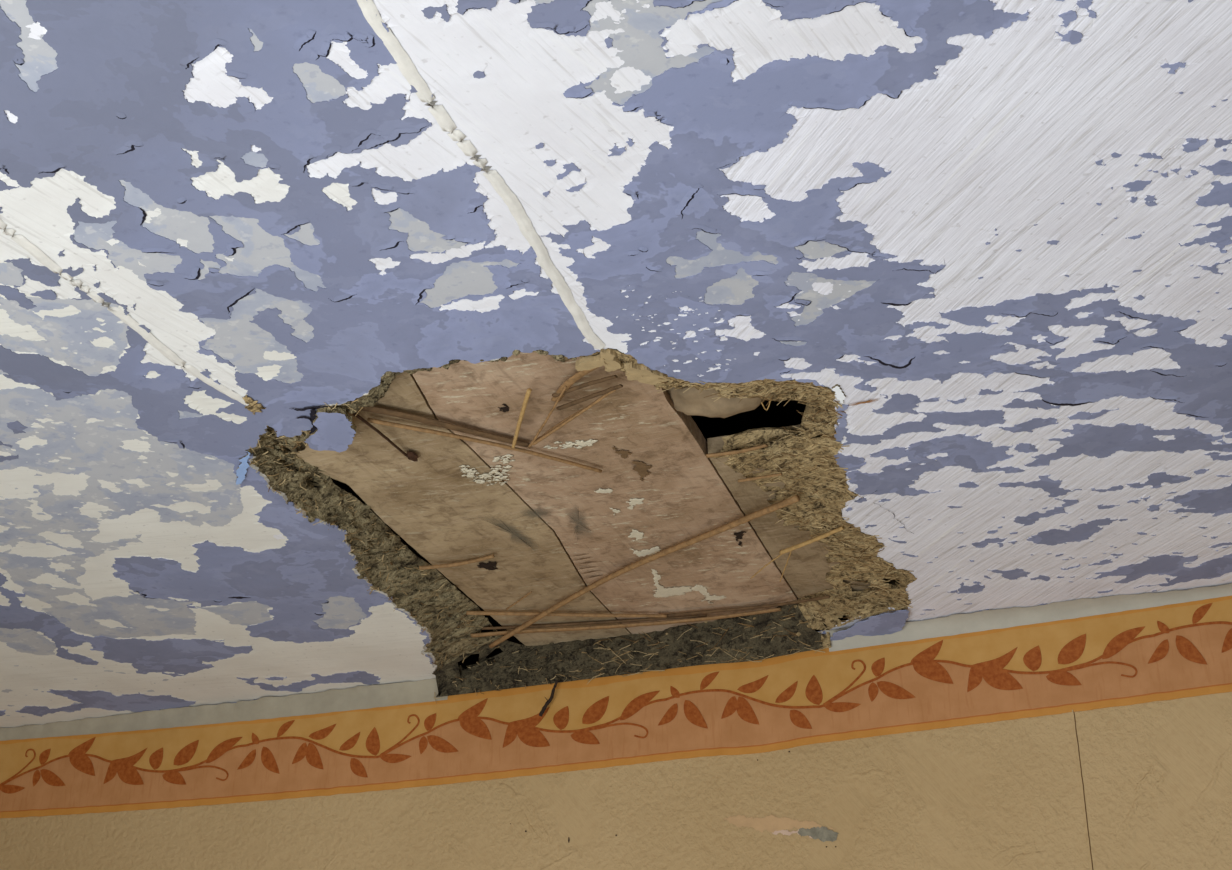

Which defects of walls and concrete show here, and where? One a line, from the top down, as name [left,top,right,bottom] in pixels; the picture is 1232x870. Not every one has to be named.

peeling [293,0,922,385]
peeling [719,0,1232,634]
peeling [543,439,597,450]
peeling [459,454,515,486]
spalling [612,447,652,481]
peeling [610,498,644,515]
peeling [628,529,726,604]
flaking render [798,826,839,842]